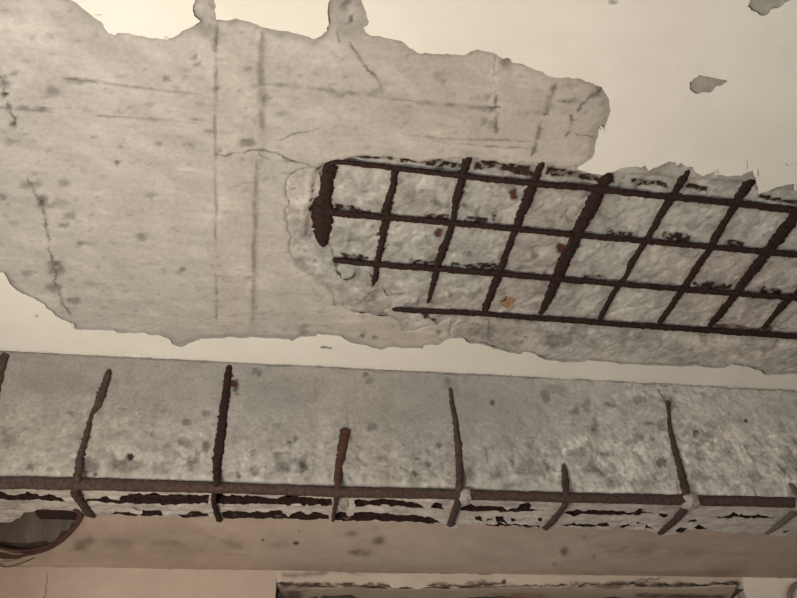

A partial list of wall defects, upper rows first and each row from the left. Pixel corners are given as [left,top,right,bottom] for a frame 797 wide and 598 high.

rust [360,156,461,172]
rust [474,160,533,176]
rust [545,166,598,182]
flaking render [0,0,797,373]
rust [631,178,667,188]
rust [759,195,797,204]
rust [424,214,449,237]
rust [662,232,691,242]
rust [451,258,501,270]
rust [693,282,732,290]
rust [500,296,515,308]
spalling [0,348,797,537]